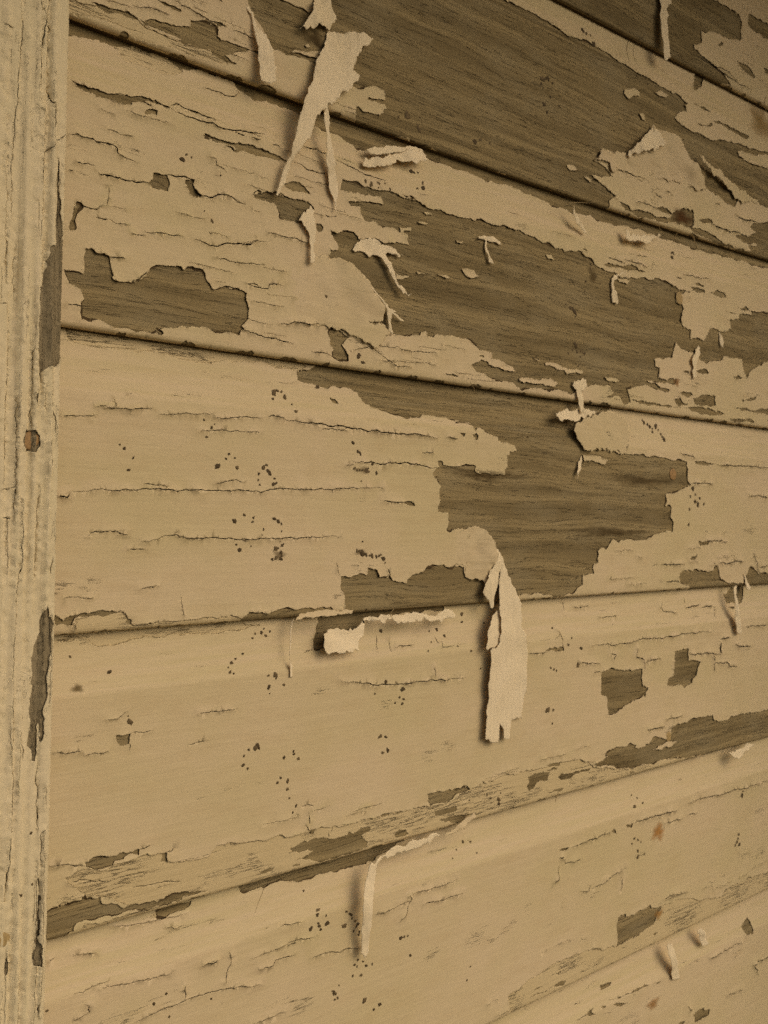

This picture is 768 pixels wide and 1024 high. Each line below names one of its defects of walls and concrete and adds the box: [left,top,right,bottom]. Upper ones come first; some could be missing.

peeling [248,0,768,267]
crack [92,531,323,550]
crack [61,405,429,503]
peeling [27,173,768,761]
peeling [32,710,768,966]